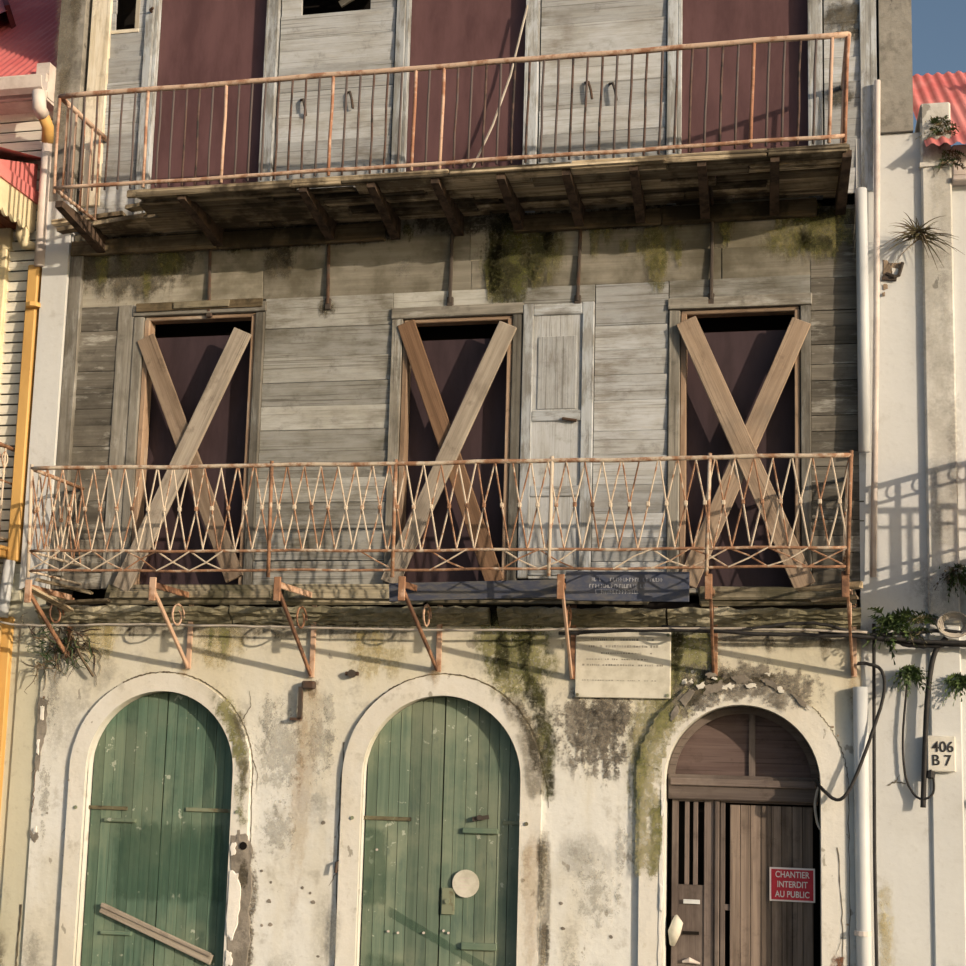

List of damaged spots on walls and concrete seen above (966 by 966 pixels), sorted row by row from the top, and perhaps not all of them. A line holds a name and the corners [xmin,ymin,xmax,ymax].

damp [464,212,556,303]
damp [793,208,844,251]
spalling [34,696,48,772]
damp [490,631,822,869]
spalling [670,670,808,722]
peeling [225,830,273,966]
damp [538,841,547,903]
damp [541,924,550,965]